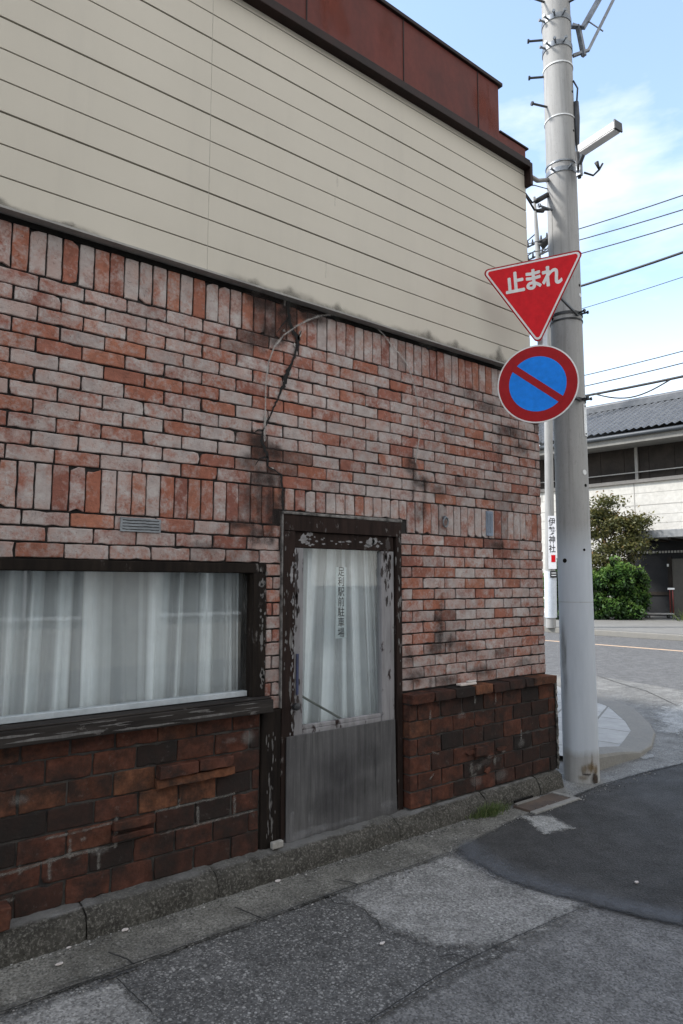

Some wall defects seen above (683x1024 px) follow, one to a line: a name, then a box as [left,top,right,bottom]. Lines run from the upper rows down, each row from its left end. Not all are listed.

crack [253,300,331,514]
crack [377,328,419,462]
peeling [0,703,258,744]
peeling [284,530,402,735]